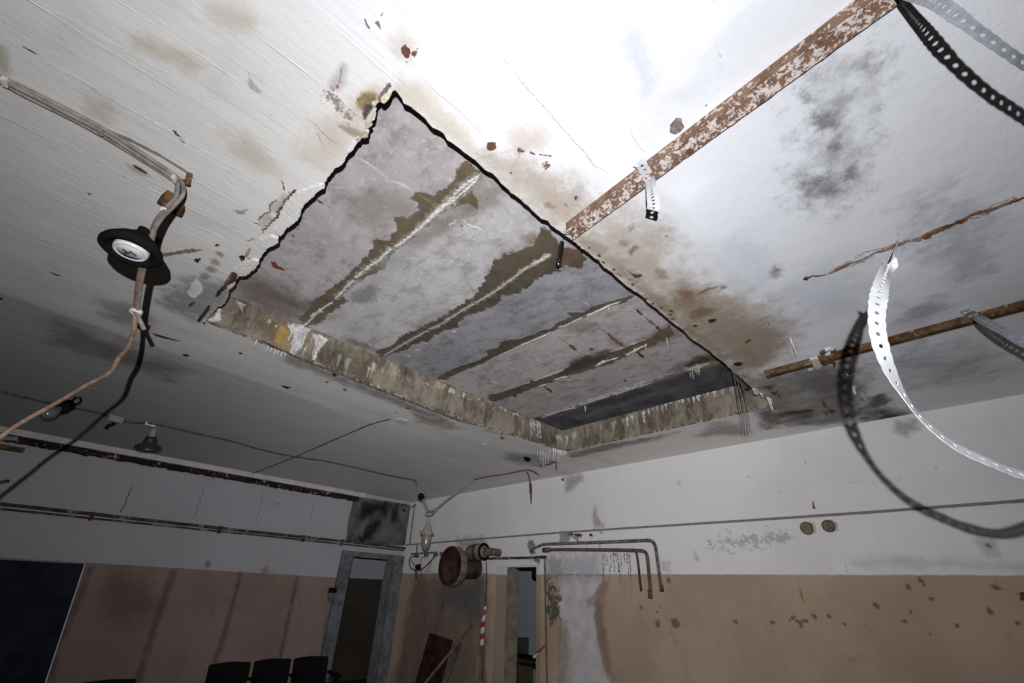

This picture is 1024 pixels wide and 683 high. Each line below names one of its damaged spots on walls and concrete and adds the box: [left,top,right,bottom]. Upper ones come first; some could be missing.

spalling [343,82,391,154]
crack [502,60,608,173]
crack [310,121,437,206]
peeling [158,183,324,322]
crack [246,180,296,241]
corrosion [803,197,1024,281]
leakage [358,227,770,437]
spalling [257,339,478,426]
leakage [546,560,562,626]